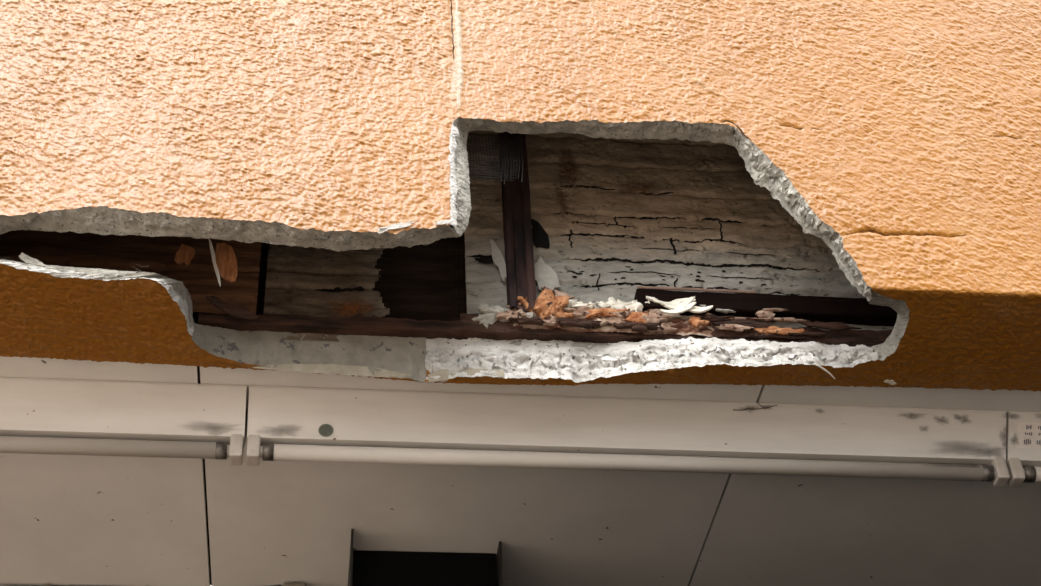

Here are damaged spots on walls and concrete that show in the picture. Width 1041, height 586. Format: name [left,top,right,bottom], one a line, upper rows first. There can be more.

spalling [0,117,910,383]
crack [552,185,820,295]
crack [844,229,967,237]